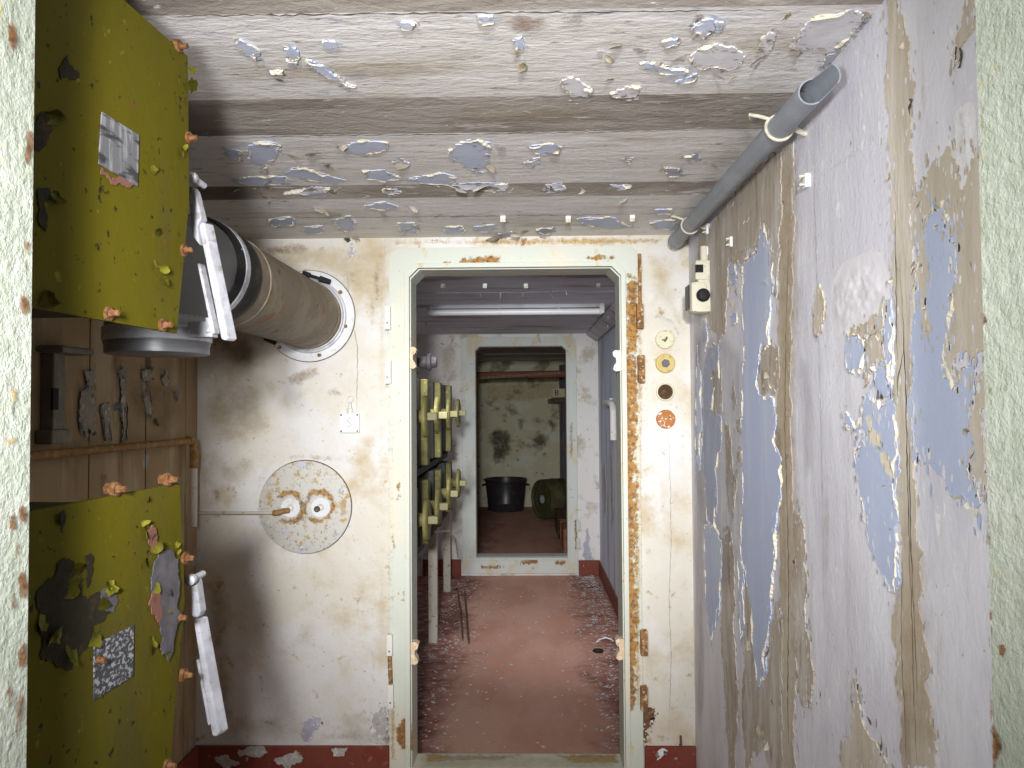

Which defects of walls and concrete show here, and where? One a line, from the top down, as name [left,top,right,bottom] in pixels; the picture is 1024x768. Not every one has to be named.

peeling [475,14,503,26]
peeling [558,72,648,104]
peeling [521,142,563,169]
peeling [222,139,513,260]
peeling [543,182,566,193]
peeling [435,215,557,241]
peeling [577,216,633,230]
flaking render [597,0,987,768]
leakage [492,431,509,457]
rust [622,273,659,746]
flaking render [214,716,324,768]
flaking render [331,747,348,757]